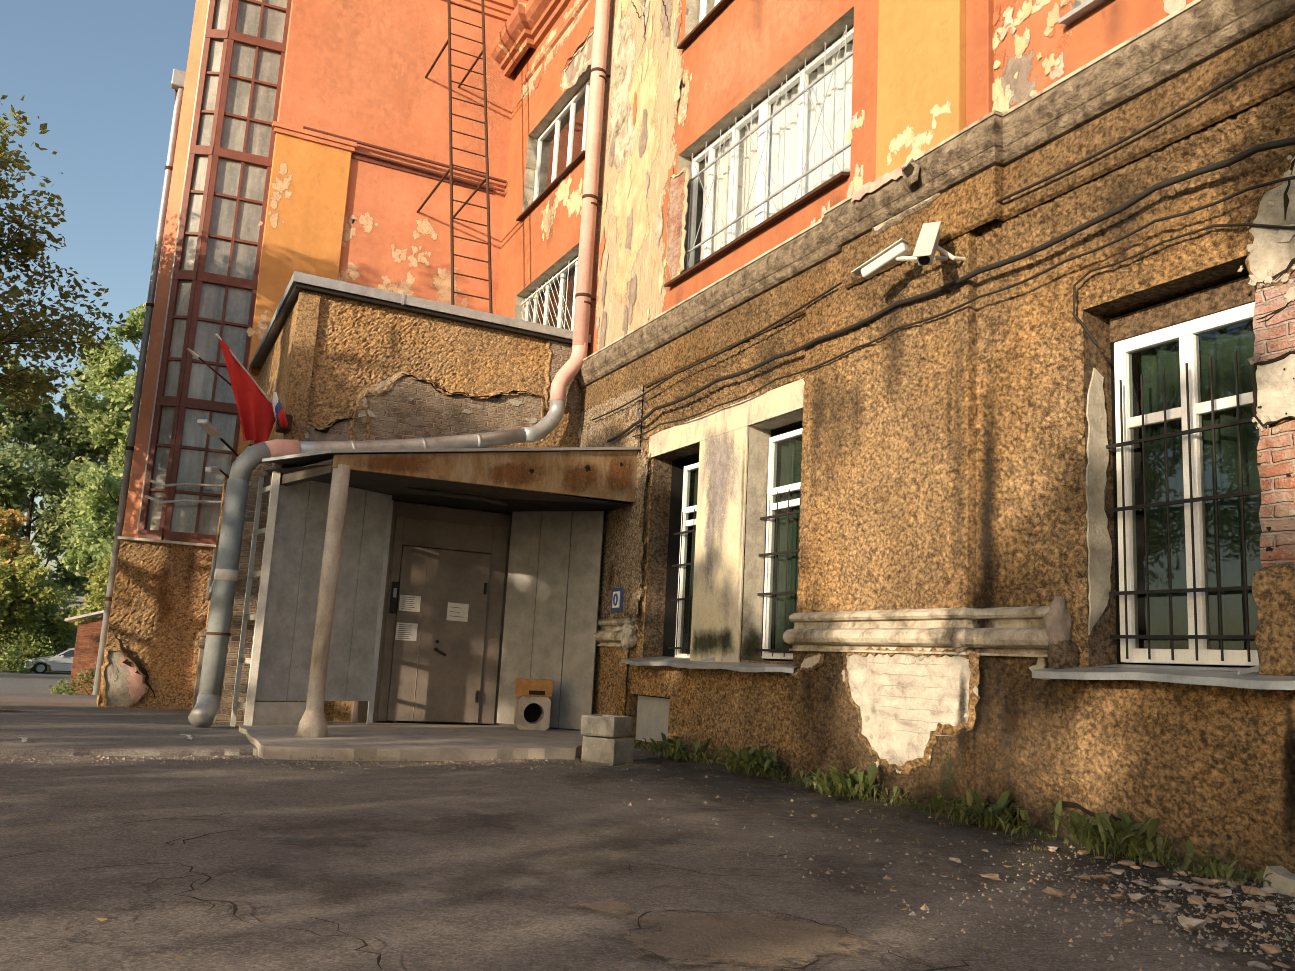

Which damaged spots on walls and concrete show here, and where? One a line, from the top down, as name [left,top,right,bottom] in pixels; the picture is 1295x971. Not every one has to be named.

peeling [992,0,1075,113]
flaking render [520,0,692,350]
peeling [887,101,952,166]
peeling [338,212,379,282]
peeling [377,218,468,308]
flaking render [1238,243,1295,365]
flaking render [305,340,649,639]
water stain [706,434,734,573]
flaking render [1252,410,1295,568]
crack [114,634,156,699]
mould [693,631,732,653]
flaking render [841,646,980,775]